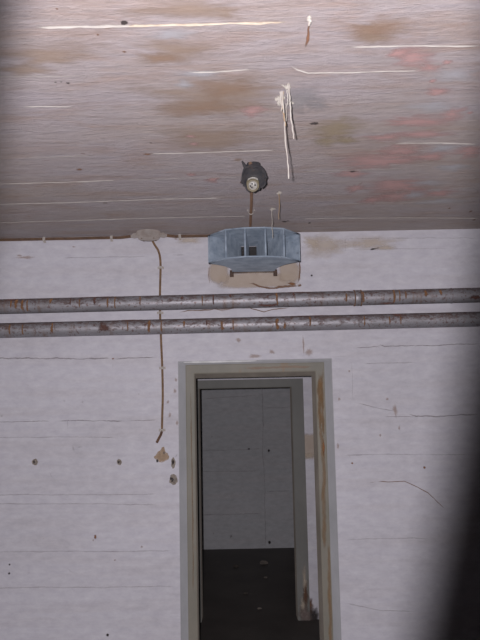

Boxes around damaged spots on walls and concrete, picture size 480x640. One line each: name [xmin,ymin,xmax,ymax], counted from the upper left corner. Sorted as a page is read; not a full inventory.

spalling [154,447,178,485]